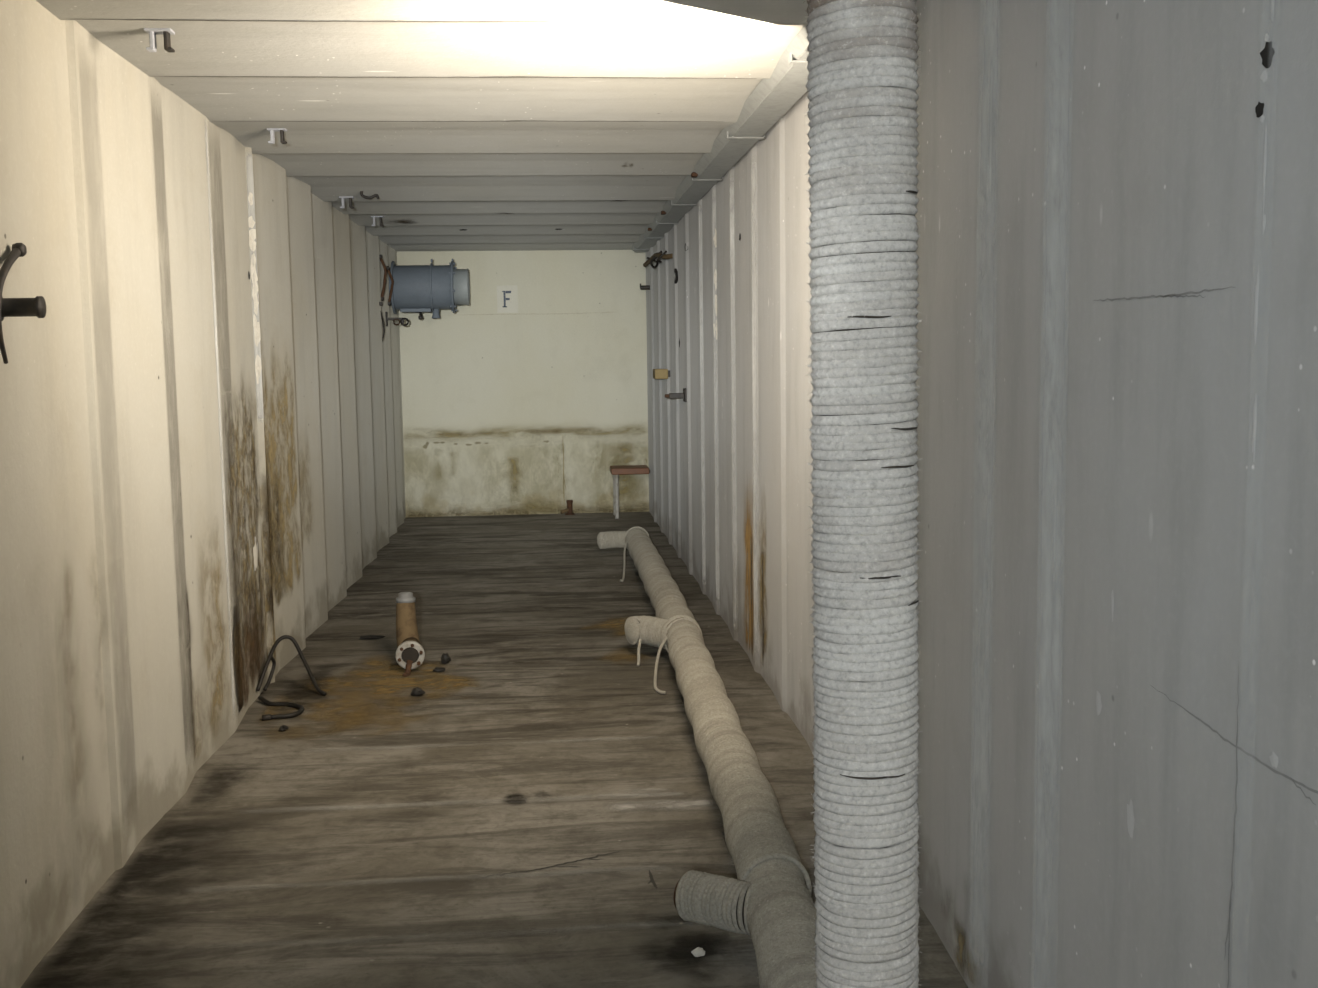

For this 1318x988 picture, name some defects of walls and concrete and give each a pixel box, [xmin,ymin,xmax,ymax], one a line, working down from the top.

crack [1093,287,1235,302]
crack [1152,663,1318,988]